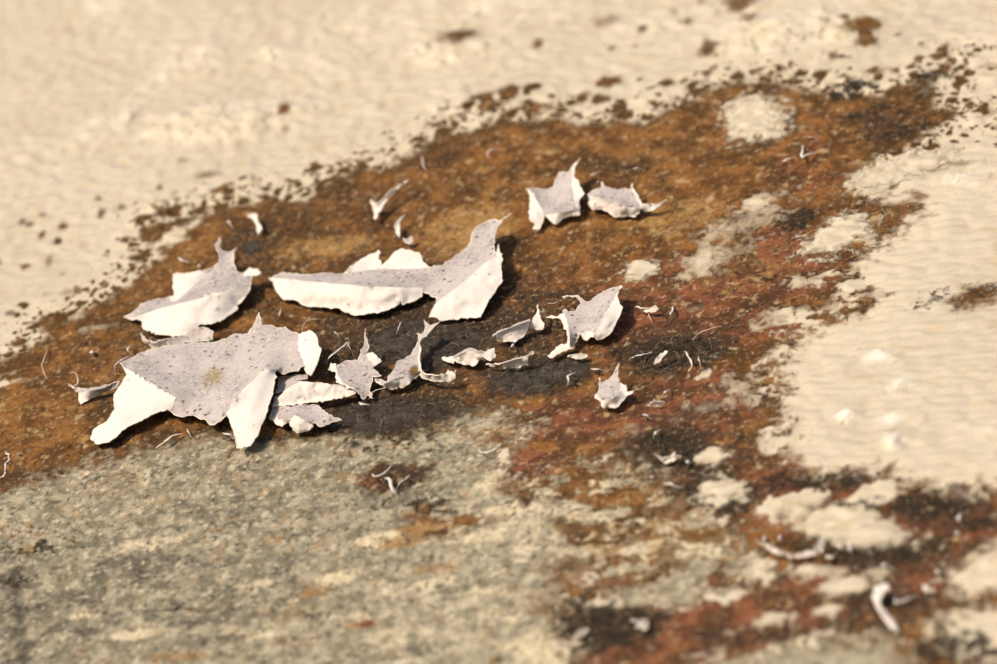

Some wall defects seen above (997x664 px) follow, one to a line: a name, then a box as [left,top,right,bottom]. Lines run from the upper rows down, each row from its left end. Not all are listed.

corrosion [596,76,620,87]
corrosion [455,92,498,123]
peeling [370,180,409,220]
peeling [526,158,667,230]
corrosion [949,285,997,310]
leakage [328,398,451,457]
spalling [0,213,826,664]
corrosion [356,459,435,494]
leakage [405,486,457,514]
leakage [1,539,54,554]
corrosion [549,518,688,603]
spalling [709,582,920,664]